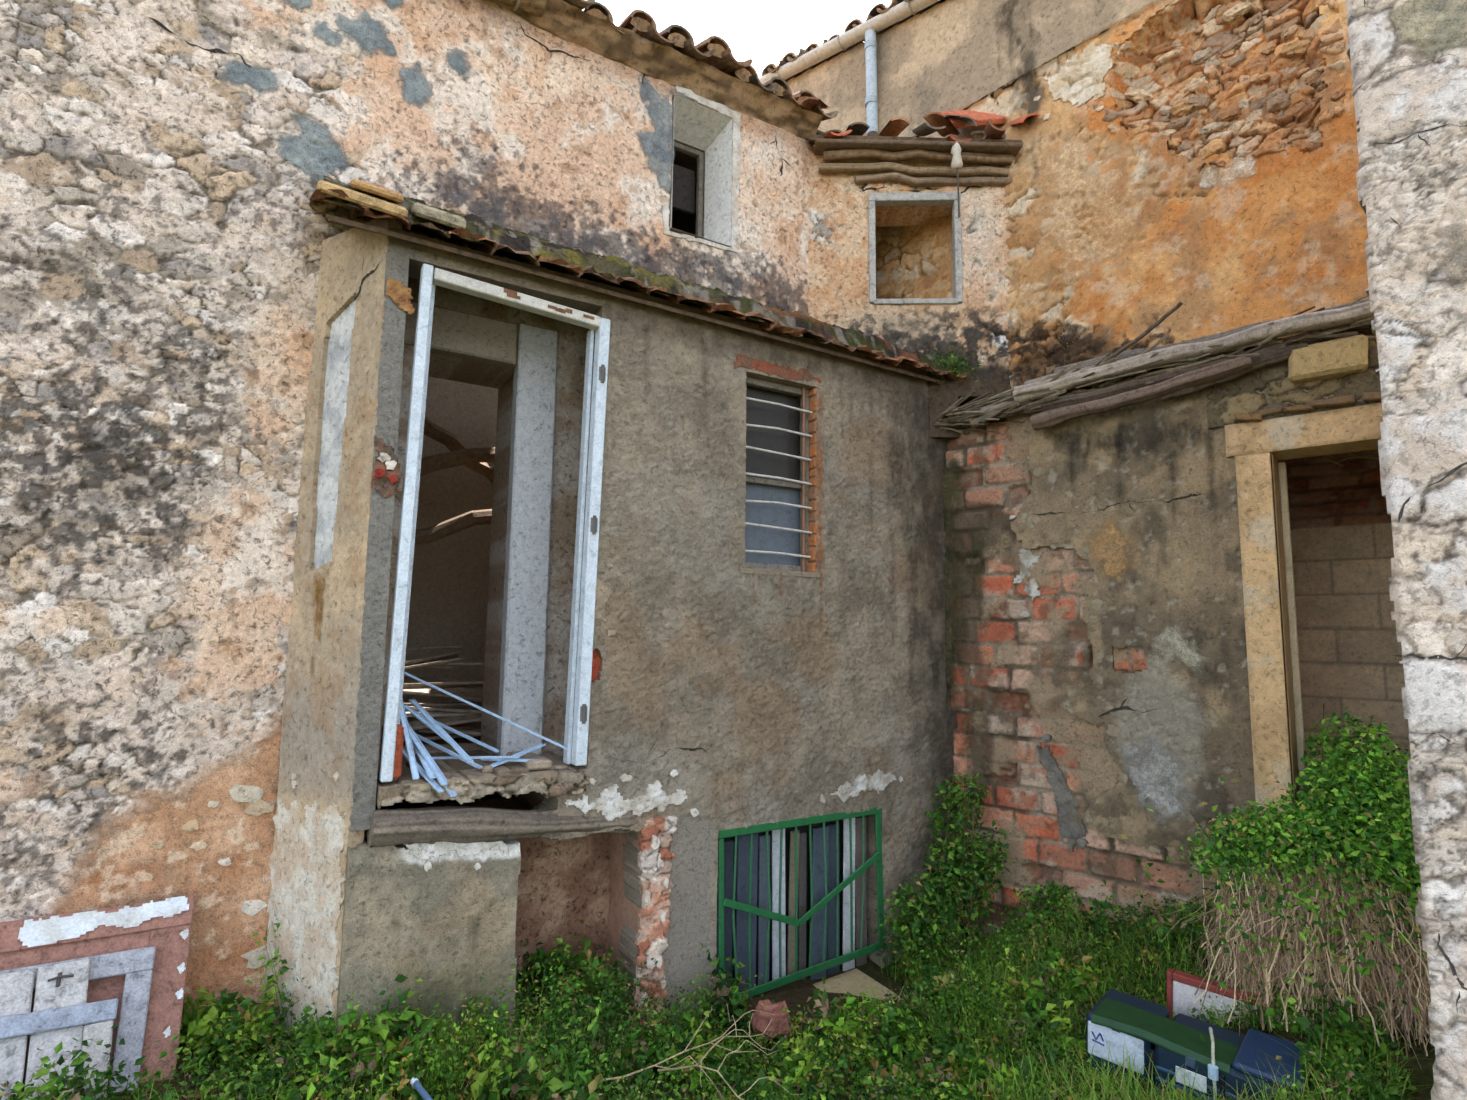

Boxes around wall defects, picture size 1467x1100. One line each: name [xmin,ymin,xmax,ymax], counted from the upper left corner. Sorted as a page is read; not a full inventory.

spalling [1033,0,1346,191]
peeling [1037,136,1145,284]
crack [1398,462,1467,523]
flaking render [945,417,1223,944]
crack [1397,644,1467,661]
peeling [819,770,903,804]
spalling [564,770,699,1028]